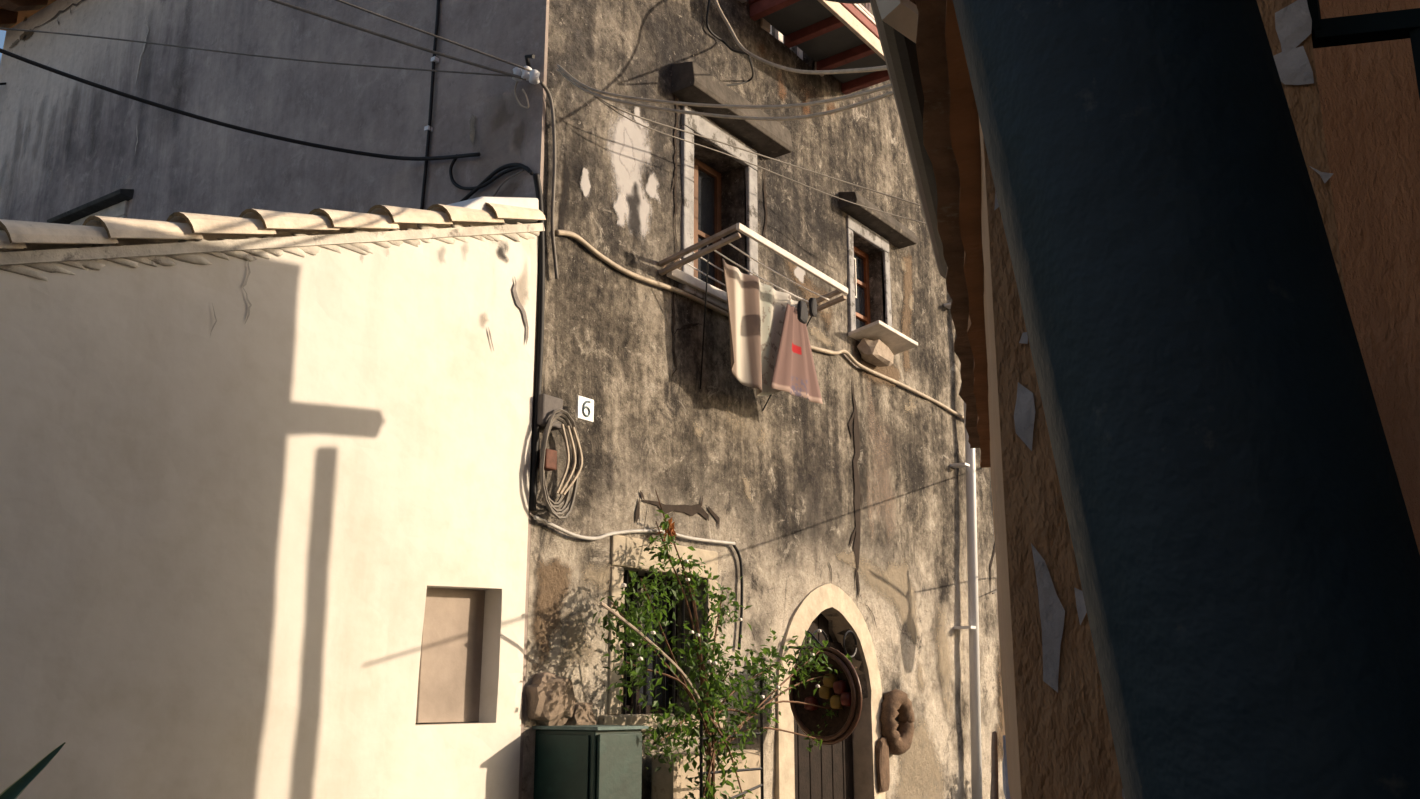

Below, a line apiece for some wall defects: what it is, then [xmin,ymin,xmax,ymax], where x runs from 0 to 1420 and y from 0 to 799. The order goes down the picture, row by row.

peeling [1273,0,1314,85]
peeling [1014,382,1035,451]
peeling [1031,543,1087,693]